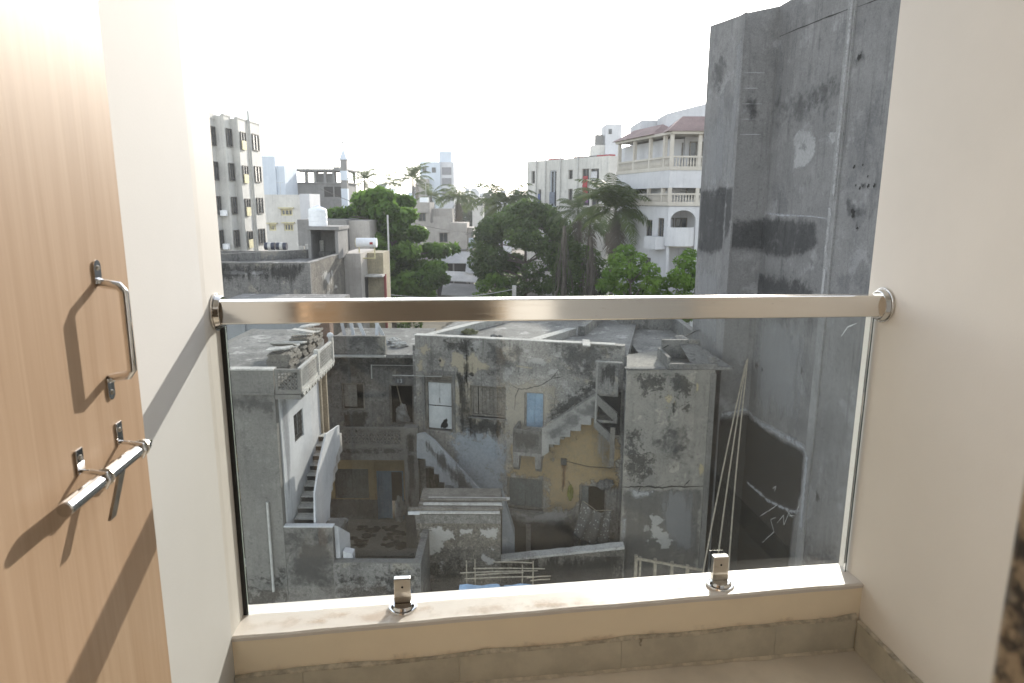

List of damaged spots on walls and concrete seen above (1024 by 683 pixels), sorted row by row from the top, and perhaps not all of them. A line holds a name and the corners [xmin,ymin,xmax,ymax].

water stain [698,188,825,256]
water stain [444,338,501,438]
water stain [637,374,691,413]
water stain [621,429,655,497]
flaking render [419,526,499,571]
flaking render [643,513,673,549]